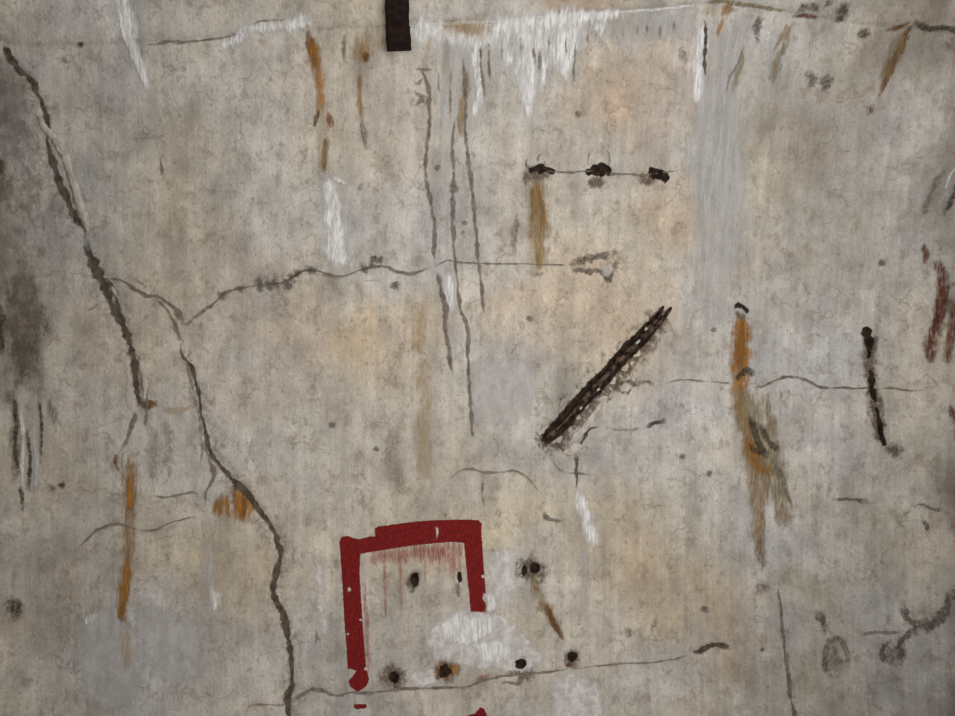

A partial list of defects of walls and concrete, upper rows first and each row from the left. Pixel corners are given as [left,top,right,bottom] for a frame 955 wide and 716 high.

damp [801,0,848,22]
rust [305,32,333,126]
damp [409,4,775,319]
rust [922,245,955,362]
crack [3,47,616,716]
flaking render [563,443,585,456]
crack [555,419,664,486]
rust [731,302,792,565]
crack [760,375,921,397]
rust [114,451,137,620]
crack [586,642,729,668]
crack [778,592,797,716]